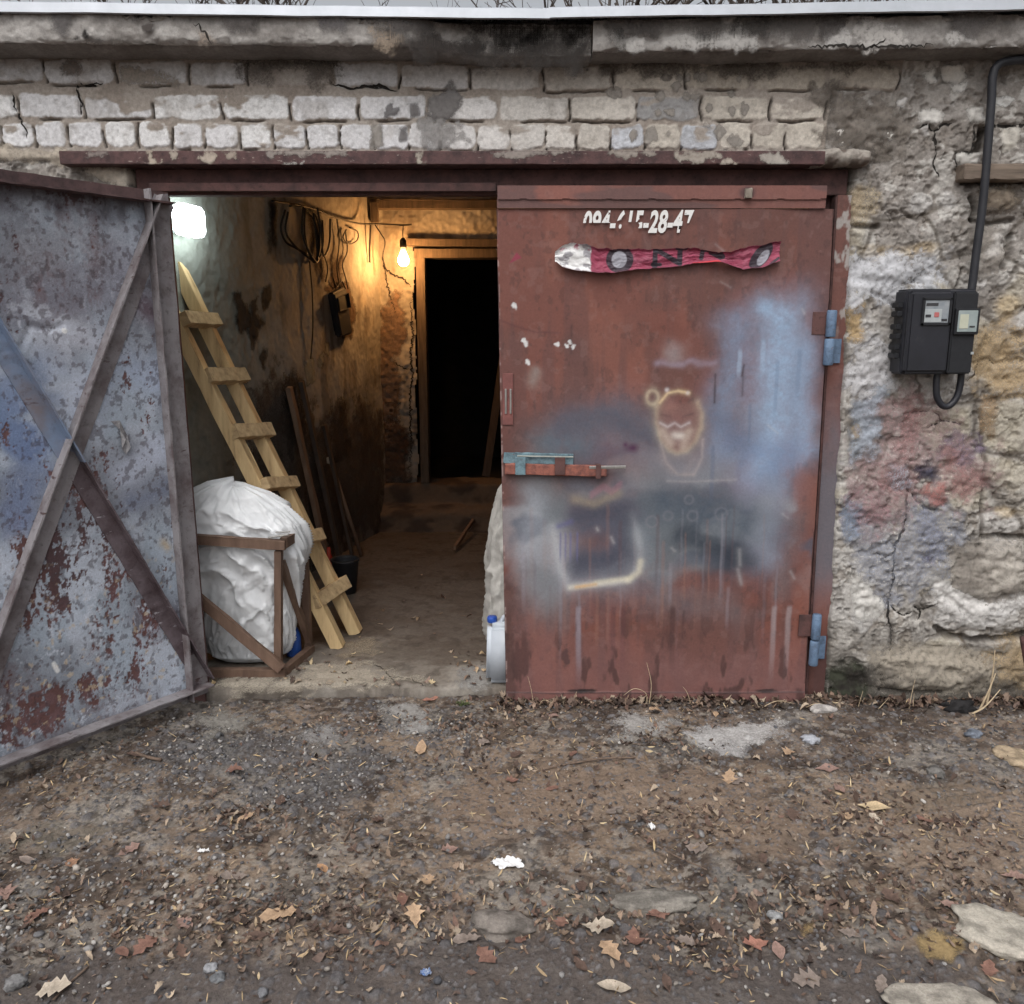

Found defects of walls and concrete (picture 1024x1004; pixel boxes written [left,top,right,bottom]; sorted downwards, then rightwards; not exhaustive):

crack [76,82,103,114]
crack [12,95,28,137]
peeling [146,150,178,164]
peeling [197,151,236,164]
peeling [266,151,347,164]
peeling [494,151,573,159]
peeling [609,151,656,160]
peeling [674,151,737,164]
peeling [759,151,788,164]
crack [919,123,1024,177]
damp [232,284,386,553]
crack [877,469,938,651]